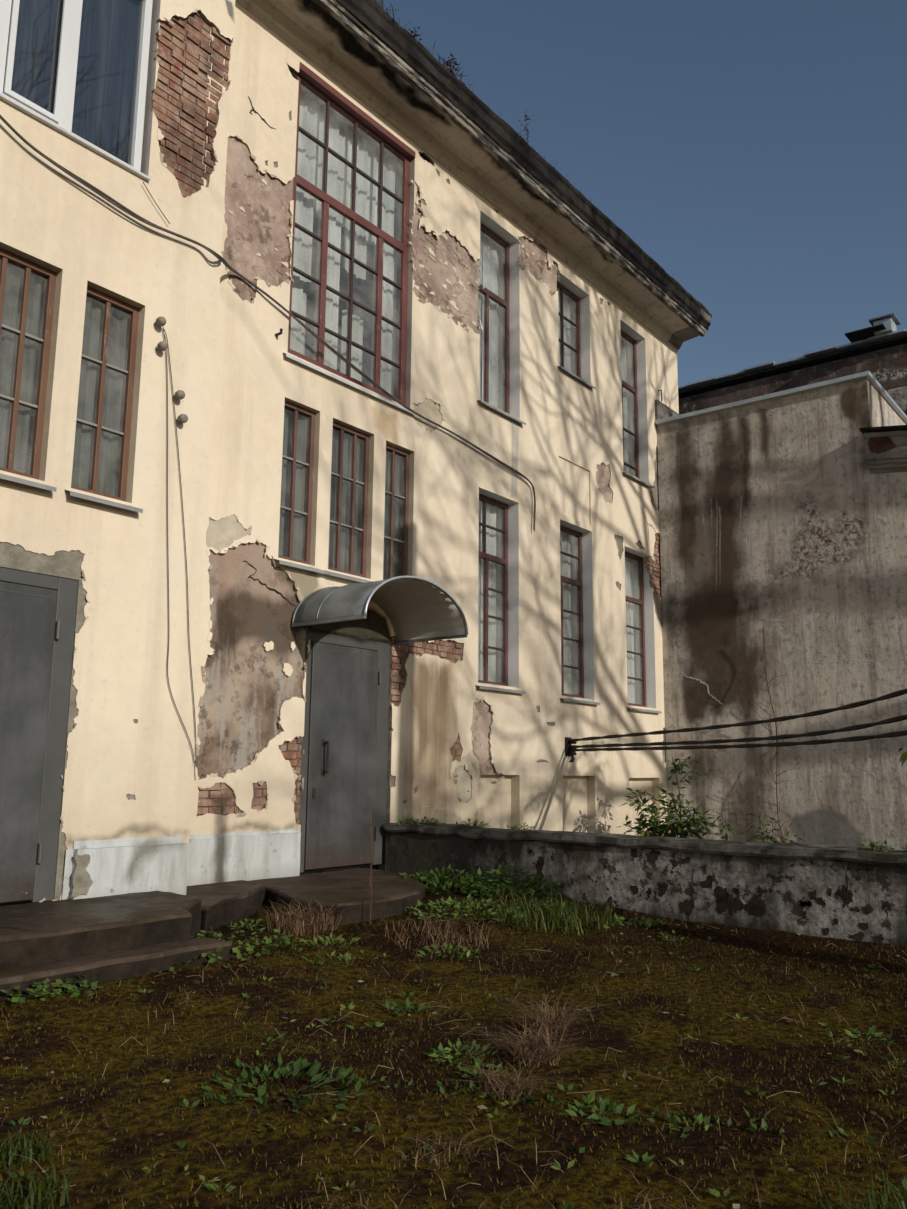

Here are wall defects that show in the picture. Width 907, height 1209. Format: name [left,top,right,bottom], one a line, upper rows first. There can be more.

flaking render [150,9,294,304]
peeling [409,180,485,333]
peeling [517,235,560,296]
peeling [872,369,907,381]
peeling [412,398,442,432]
peeling [596,463,612,502]
water stain [672,410,768,722]
peeling [776,501,866,580]
peeling [194,514,310,825]
flaking render [390,636,462,709]
crack [679,672,722,704]
peeling [450,697,504,803]